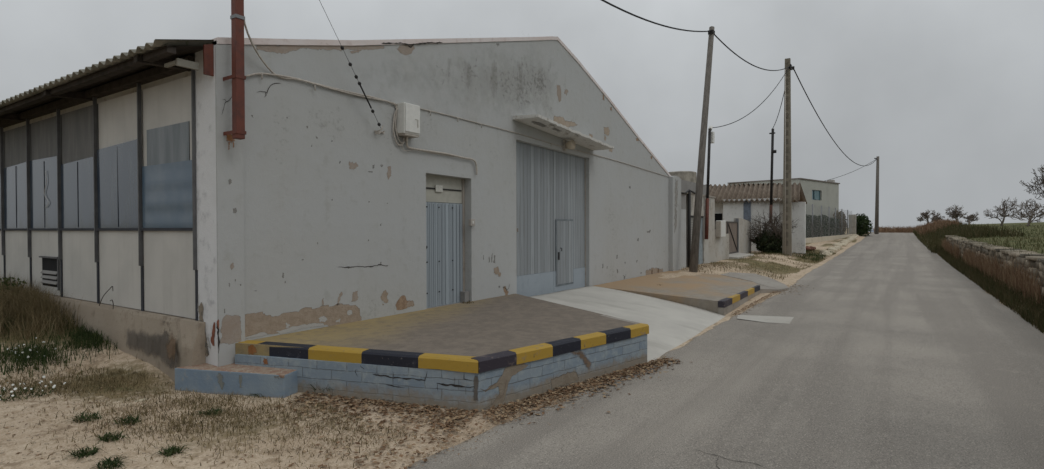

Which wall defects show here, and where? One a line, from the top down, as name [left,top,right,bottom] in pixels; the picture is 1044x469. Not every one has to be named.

peeling [256,45,384,54]
peeling [398,44,415,55]
peeling [198,291,362,357]